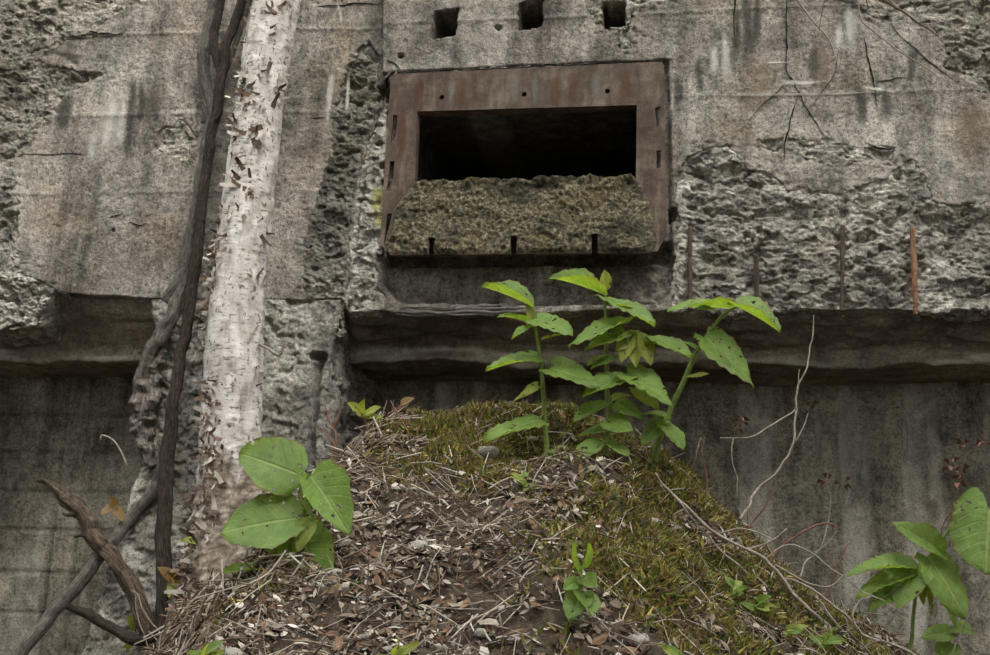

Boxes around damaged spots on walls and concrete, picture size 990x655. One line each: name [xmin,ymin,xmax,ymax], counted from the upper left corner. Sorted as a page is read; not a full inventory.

spalling [0,179,76,347]
crack [20,150,79,158]
spalling [0,0,147,164]
spalling [669,139,990,323]